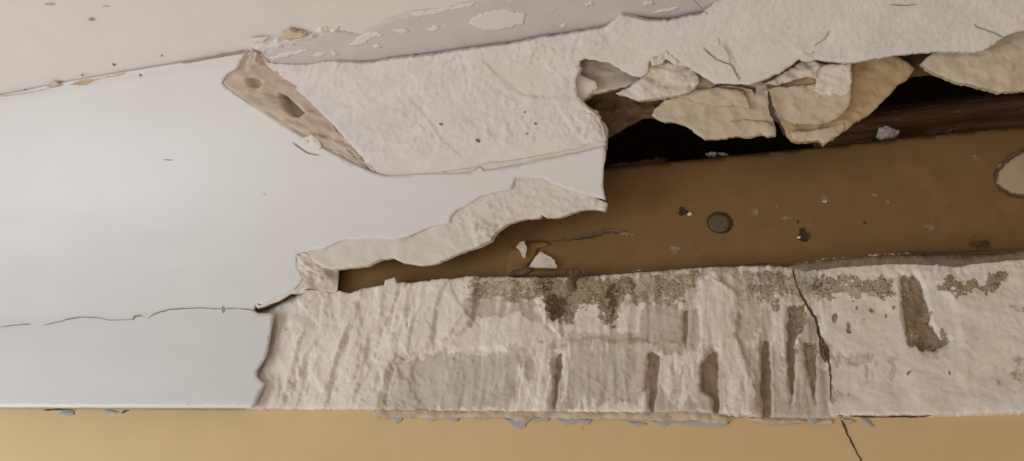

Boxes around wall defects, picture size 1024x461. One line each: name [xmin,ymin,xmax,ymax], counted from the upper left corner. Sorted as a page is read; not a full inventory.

crack [2,289,317,327]
flaking render [181,0,1024,429]
crack [512,262,932,461]
water stain [771,298,819,364]